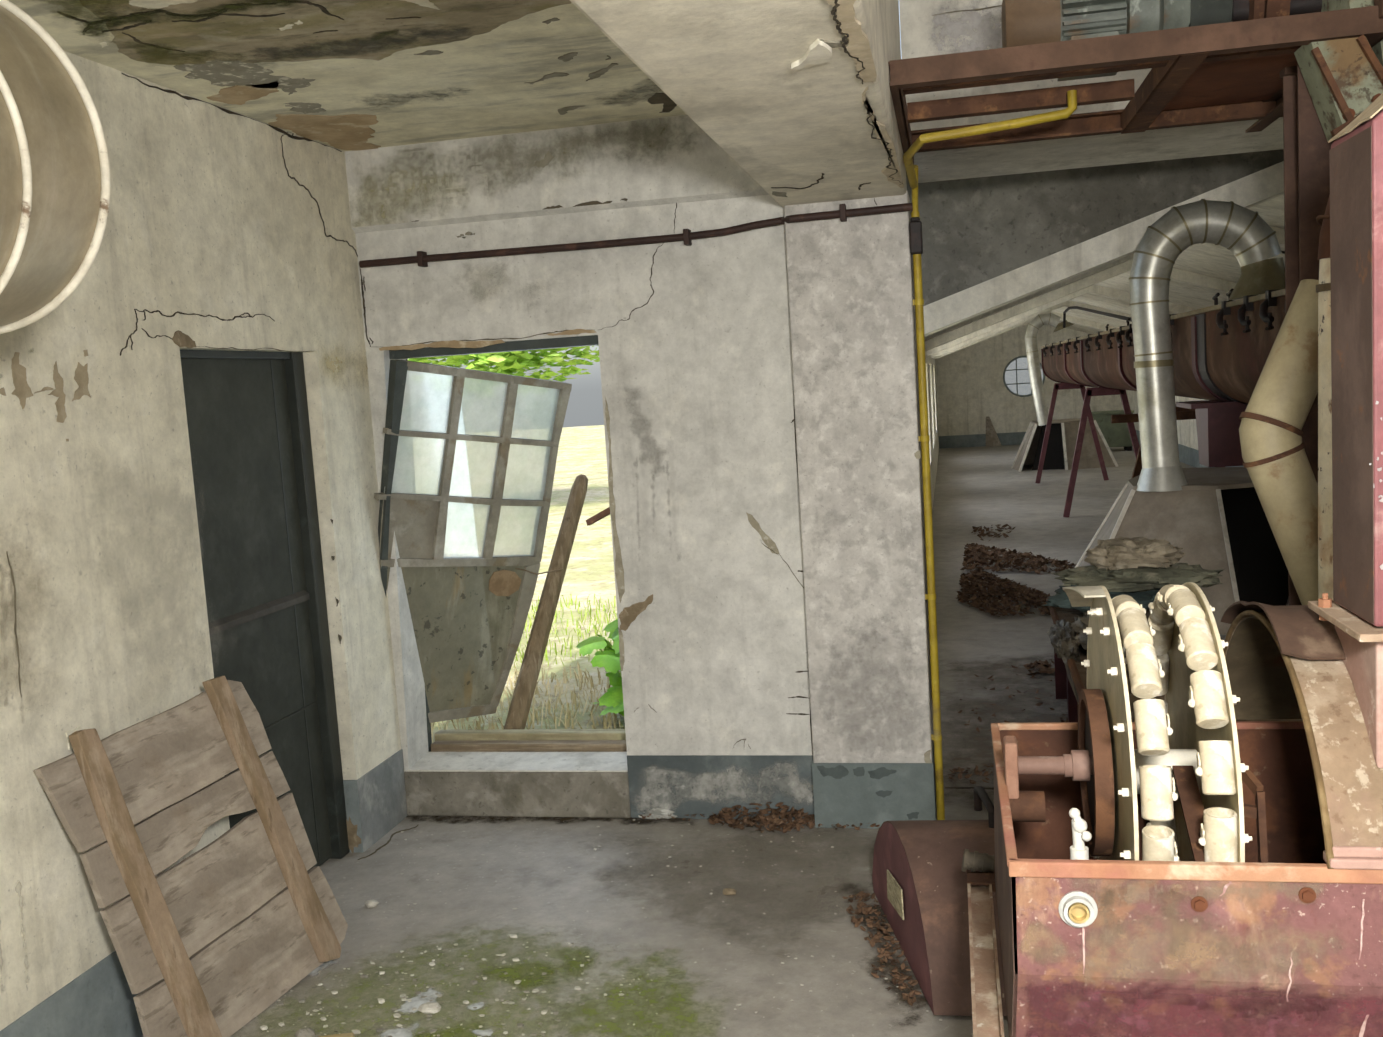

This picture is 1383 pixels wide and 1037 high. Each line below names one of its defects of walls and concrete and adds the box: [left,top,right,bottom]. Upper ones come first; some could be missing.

crack [57,1,344,52]
spalling [84,0,578,151]
water stain [604,79,664,104]
peeling [647,93,677,113]
crack [831,0,903,205]
water stain [365,123,669,219]
crack [771,173,824,189]
crack [122,73,677,347]
crack [120,309,308,356]
peeling [0,350,91,442]
peeling [637,763,897,811]
efflorescence [383,988,440,1037]